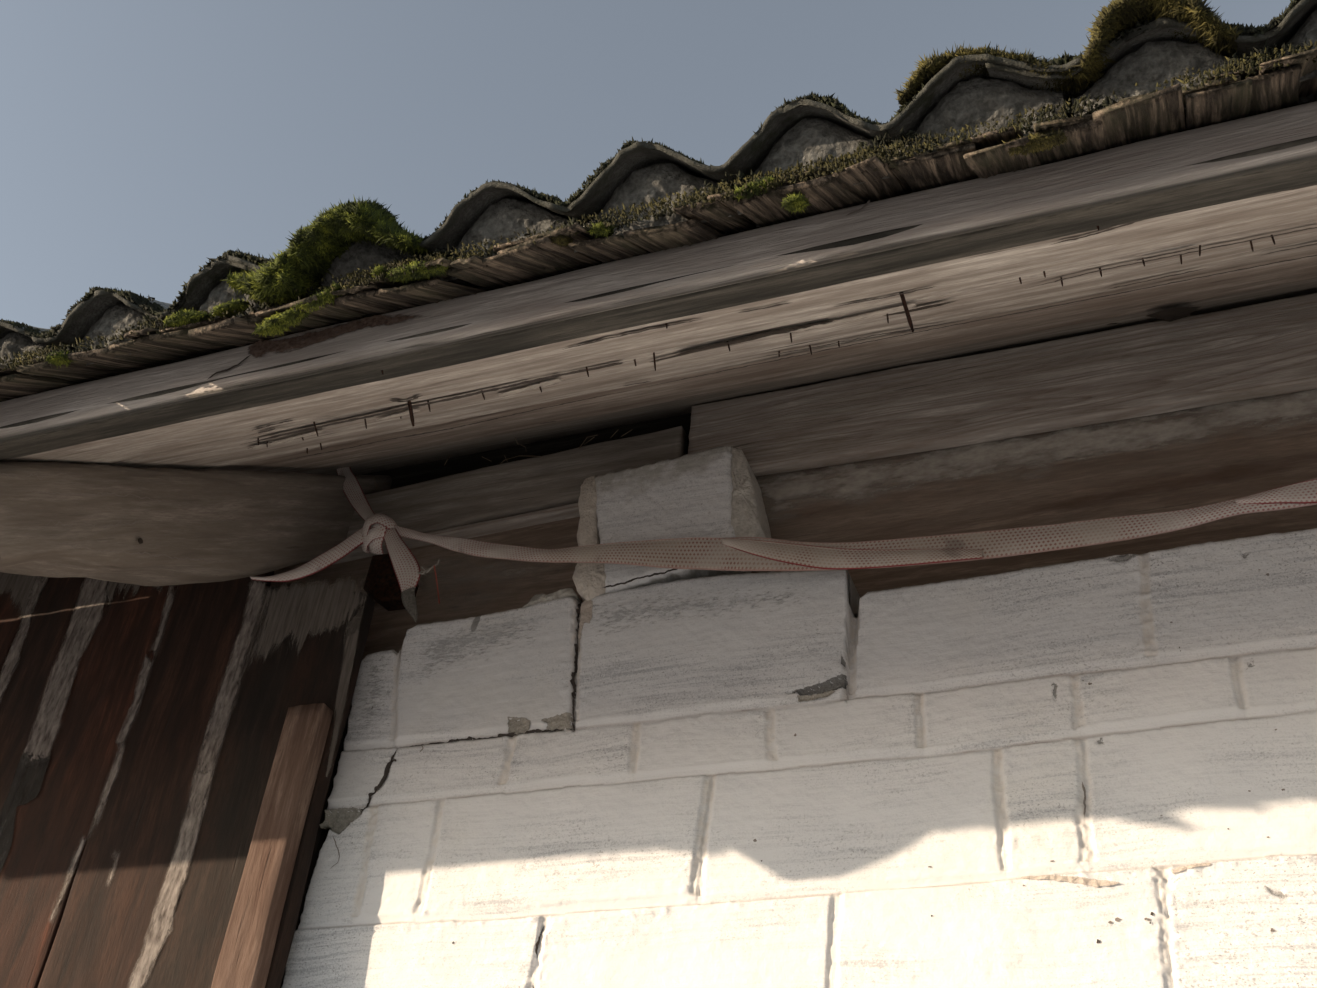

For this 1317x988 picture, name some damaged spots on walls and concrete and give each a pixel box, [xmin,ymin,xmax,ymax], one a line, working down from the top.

crack [361,569,677,813]